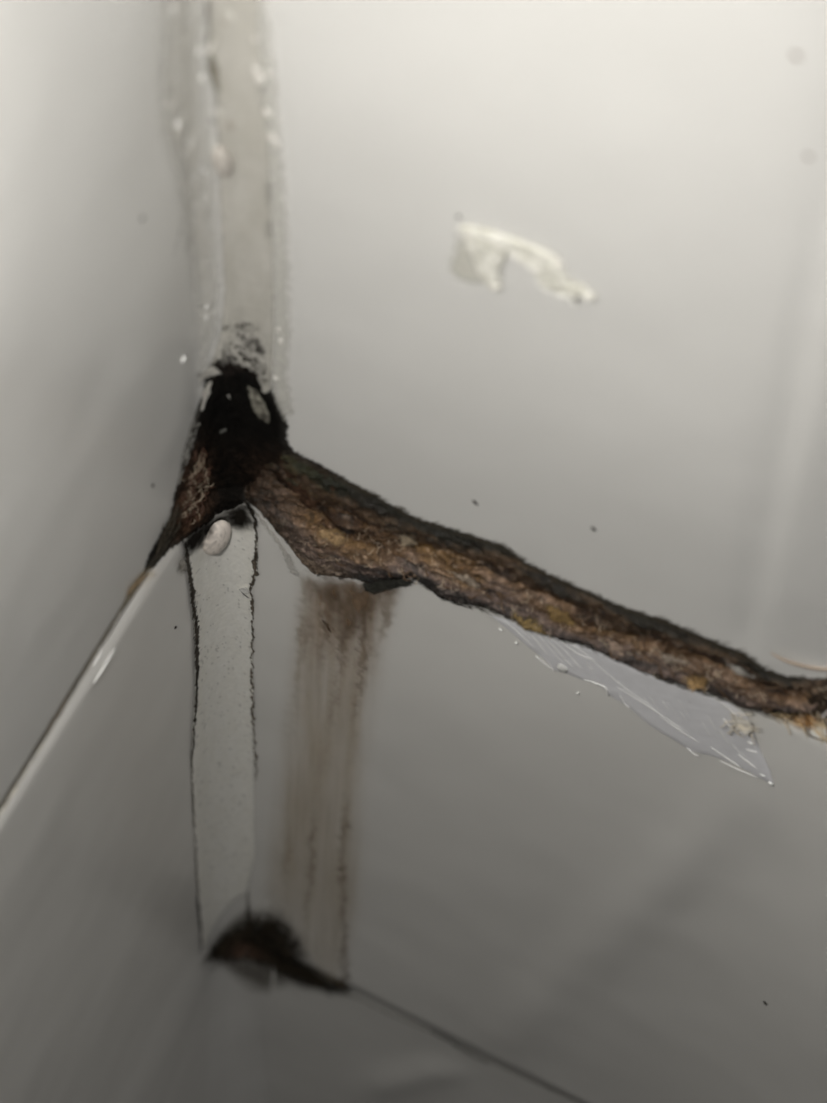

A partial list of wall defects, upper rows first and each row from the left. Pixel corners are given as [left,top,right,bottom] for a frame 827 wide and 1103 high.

crack [178,541,203,953]
crack [239,502,259,776]